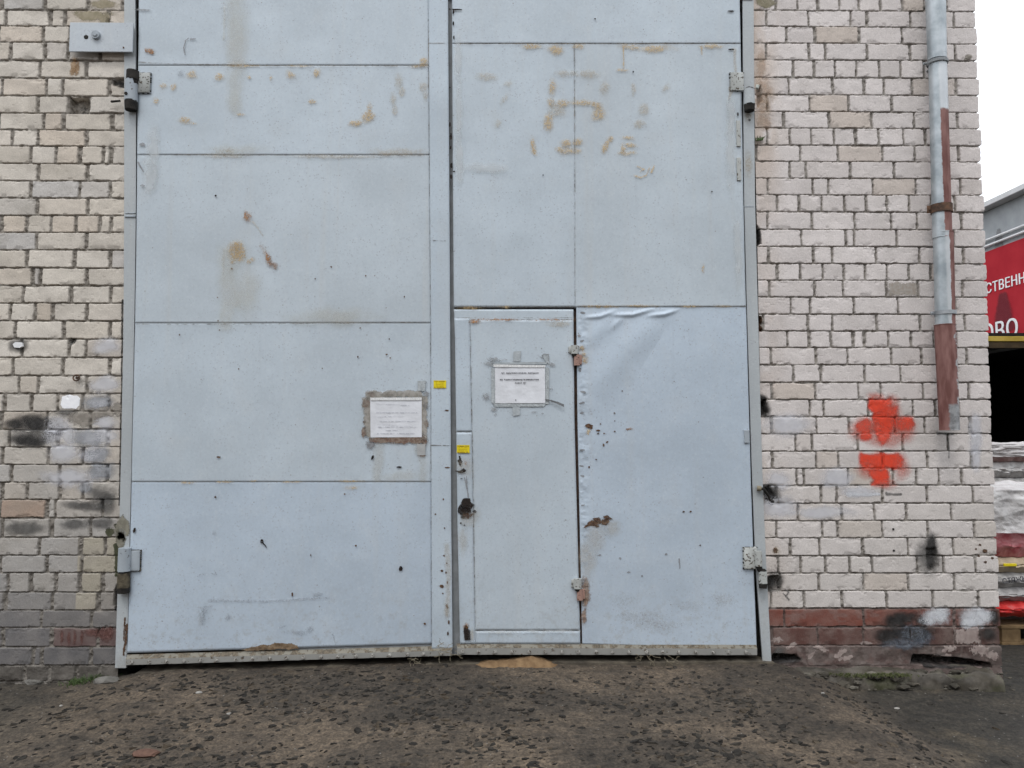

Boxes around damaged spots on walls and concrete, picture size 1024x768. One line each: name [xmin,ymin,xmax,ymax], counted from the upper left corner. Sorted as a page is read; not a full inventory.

rust [581,578,590,623]